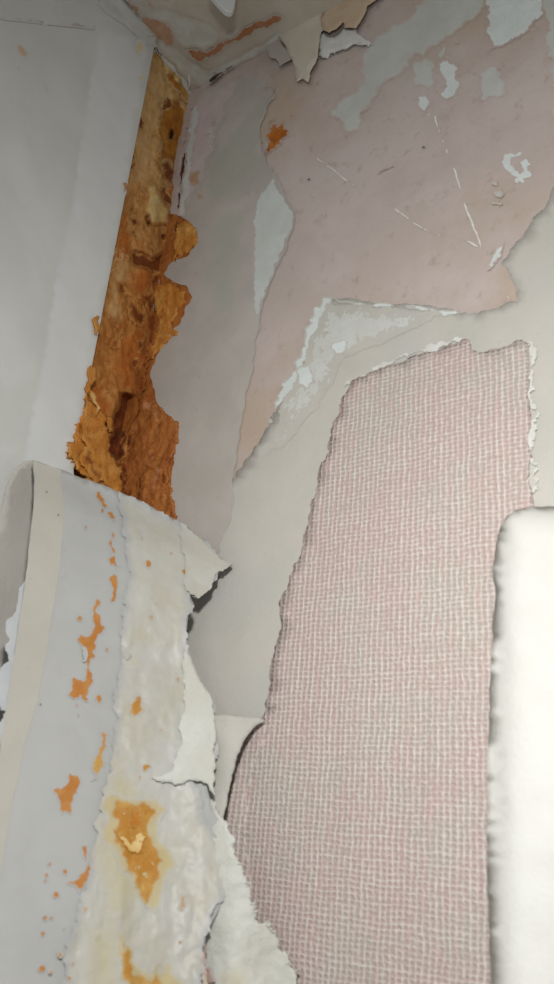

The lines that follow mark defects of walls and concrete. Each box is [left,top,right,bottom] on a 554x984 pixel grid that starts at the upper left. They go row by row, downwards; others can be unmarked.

peeling [267,0,554,137]
rust [264,113,294,154]
peeling [499,150,532,184]